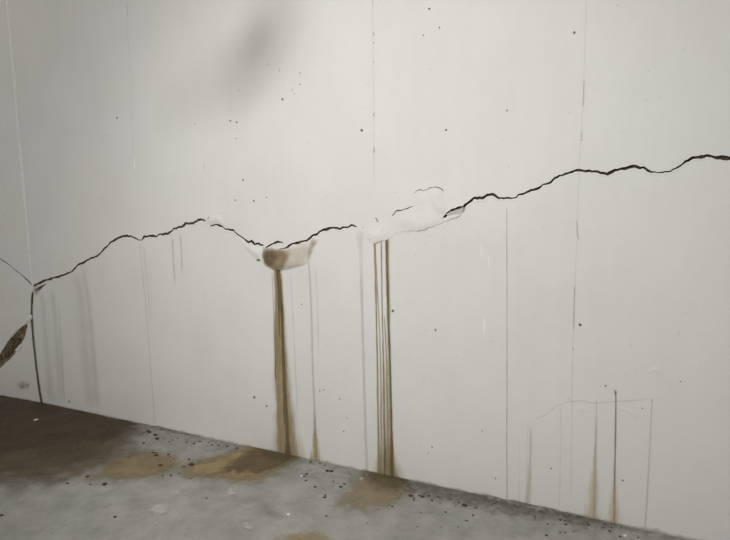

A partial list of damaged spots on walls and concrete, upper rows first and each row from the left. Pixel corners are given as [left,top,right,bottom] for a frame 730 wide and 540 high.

peeling [357,189,464,244]
crack [414,186,443,195]
crack [443,154,730,218]
crack [1,217,357,305]
spalling [0,315,33,368]